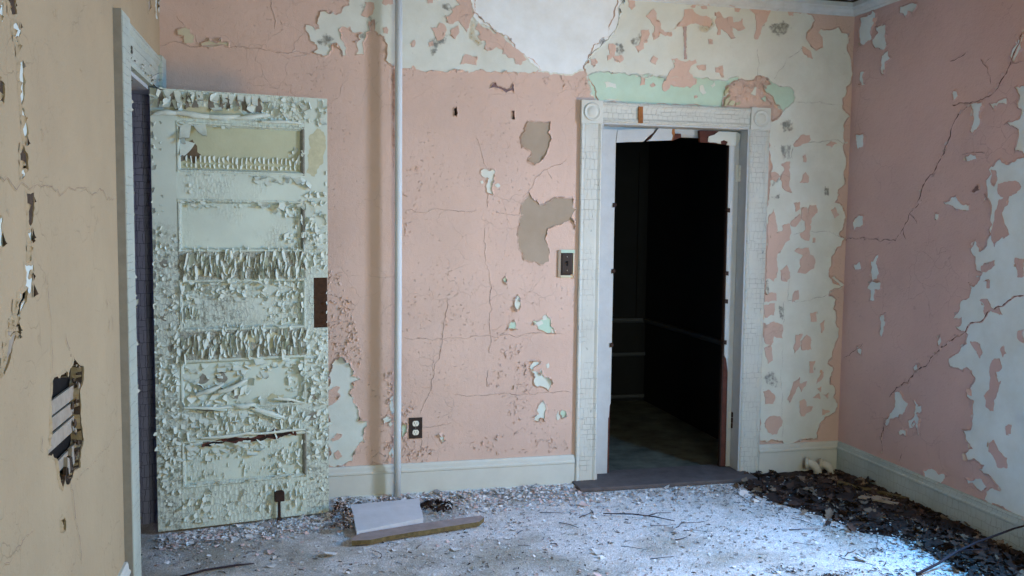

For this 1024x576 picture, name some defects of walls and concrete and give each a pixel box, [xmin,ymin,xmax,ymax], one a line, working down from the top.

peeling [0,0,39,378]
spalling [47,355,84,491]
peeling [131,46,409,528]
crack [404,159,571,450]
peeling [303,0,891,444]
peeling [884,390,923,437]
crack [846,29,1024,244]
crack [889,295,1024,398]
peeling [933,84,1024,521]